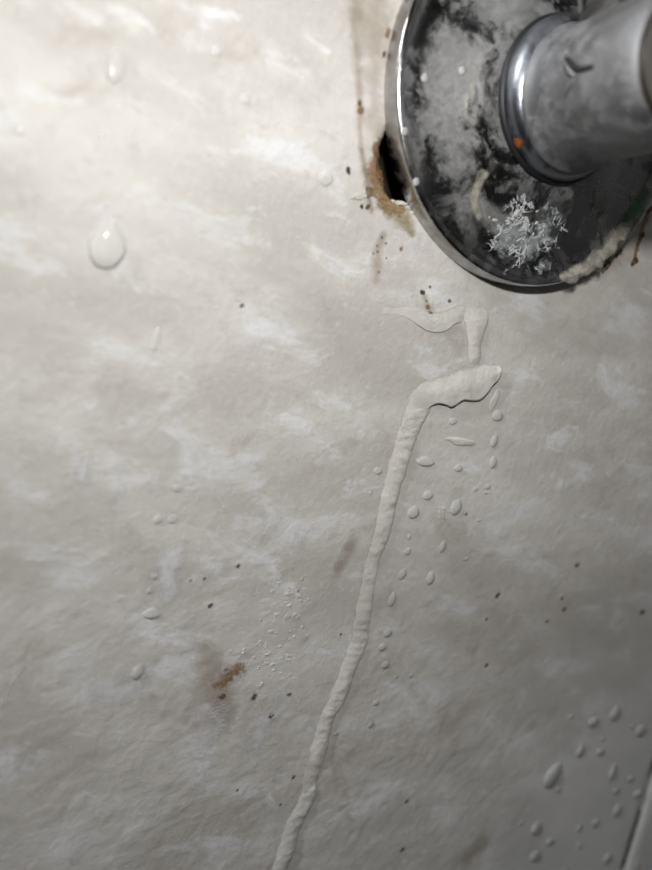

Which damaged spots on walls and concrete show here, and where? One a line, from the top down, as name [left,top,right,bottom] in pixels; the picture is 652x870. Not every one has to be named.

corrosion [360,139,413,234]
spalling [373,132,414,215]